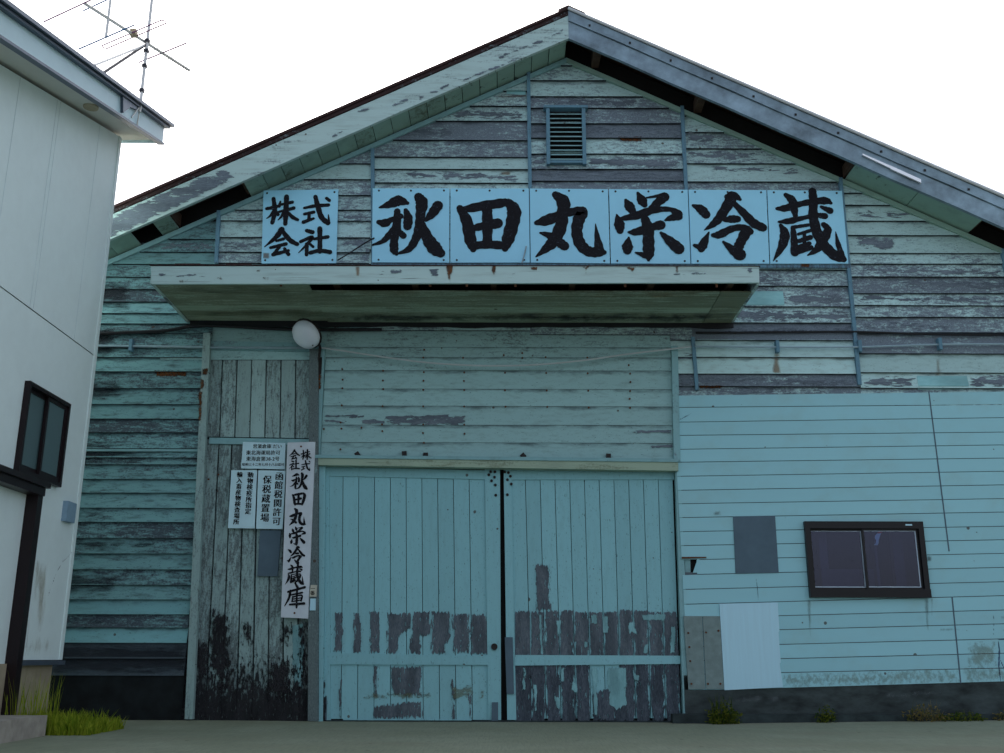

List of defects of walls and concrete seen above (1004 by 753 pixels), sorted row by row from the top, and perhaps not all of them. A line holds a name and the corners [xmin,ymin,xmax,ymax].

peeling [464,29,563,80]
peeling [588,126,798,174]
peeling [407,170,518,182]
peeling [111,170,234,237]
peeling [856,237,894,250]
damp [93,382,122,397]
peeling [324,414,465,425]
damp [85,442,137,460]
damp [71,575,116,591]
damp [53,608,308,721]
peeling [334,611,487,719]
peeling [515,564,680,721]